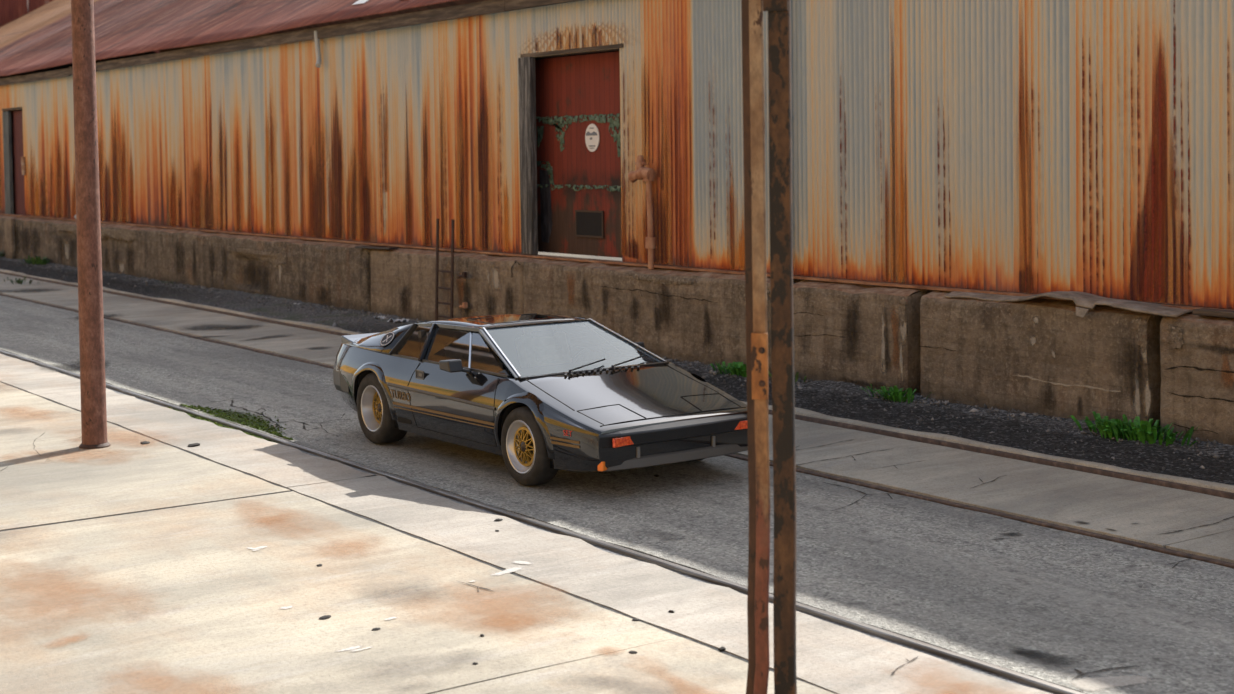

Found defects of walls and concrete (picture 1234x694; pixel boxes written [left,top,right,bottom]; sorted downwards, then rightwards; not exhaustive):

rust [170,95,388,243]
rust [405,80,509,252]
rust [622,61,691,266]
rust [1019,62,1039,292]
rust [1082,42,1104,297]
rust [1123,0,1191,304]
water stain [176,247,226,279]
water stain [188,325,285,341]
water stain [487,270,513,315]
water stain [882,317,906,373]
water stain [1125,343,1151,416]
crack [1165,366,1234,434]